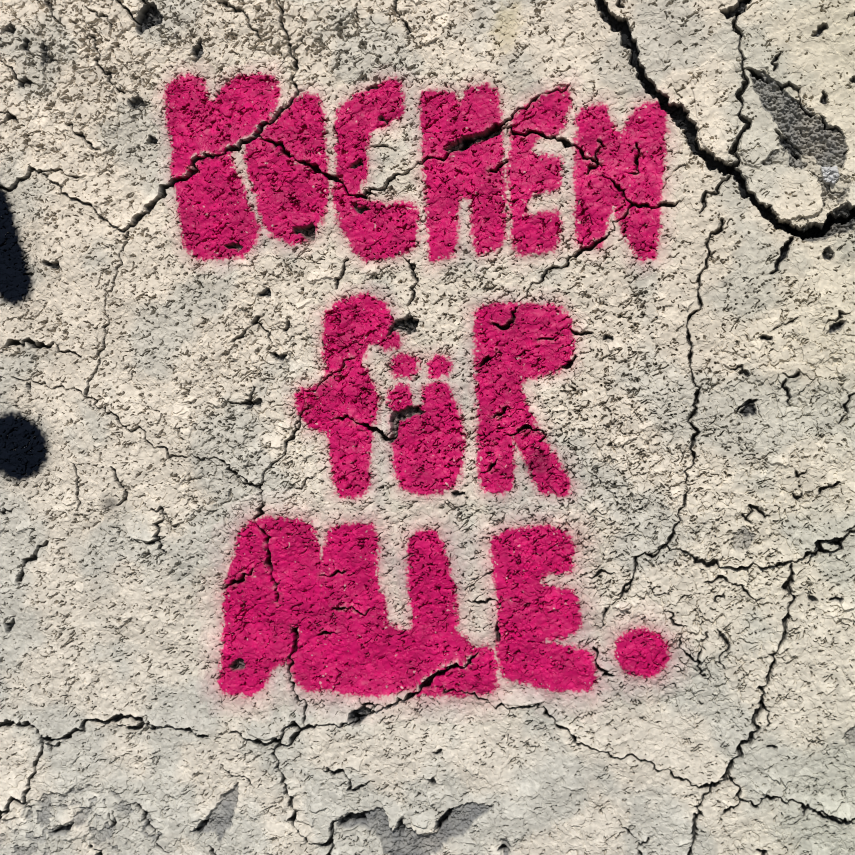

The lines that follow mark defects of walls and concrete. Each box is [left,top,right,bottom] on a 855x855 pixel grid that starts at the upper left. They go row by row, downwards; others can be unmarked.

flaking render [750,54,855,261]
crack [0,0,855,604]
crack [229,218,855,855]
crack [88,845,103,855]
crack [0,714,209,821]
crack [108,802,169,854]
crack [222,765,253,787]